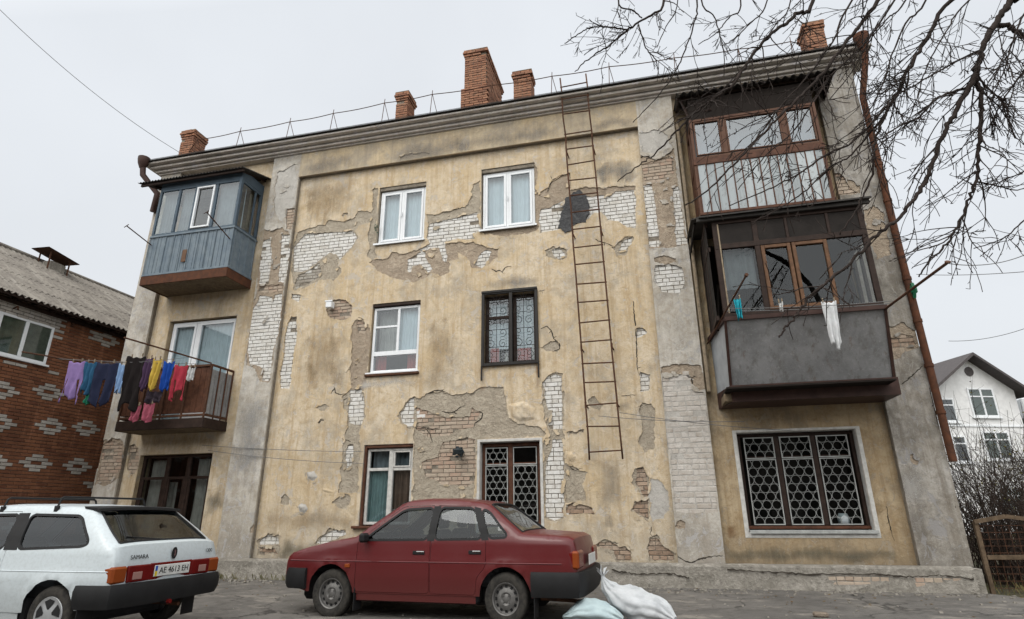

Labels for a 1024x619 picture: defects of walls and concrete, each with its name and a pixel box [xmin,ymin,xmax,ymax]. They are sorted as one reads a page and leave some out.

flaking render [246,128,688,389]
flaking render [317,299,371,511]
flaking render [397,372,594,524]
flaking render [596,360,718,562]